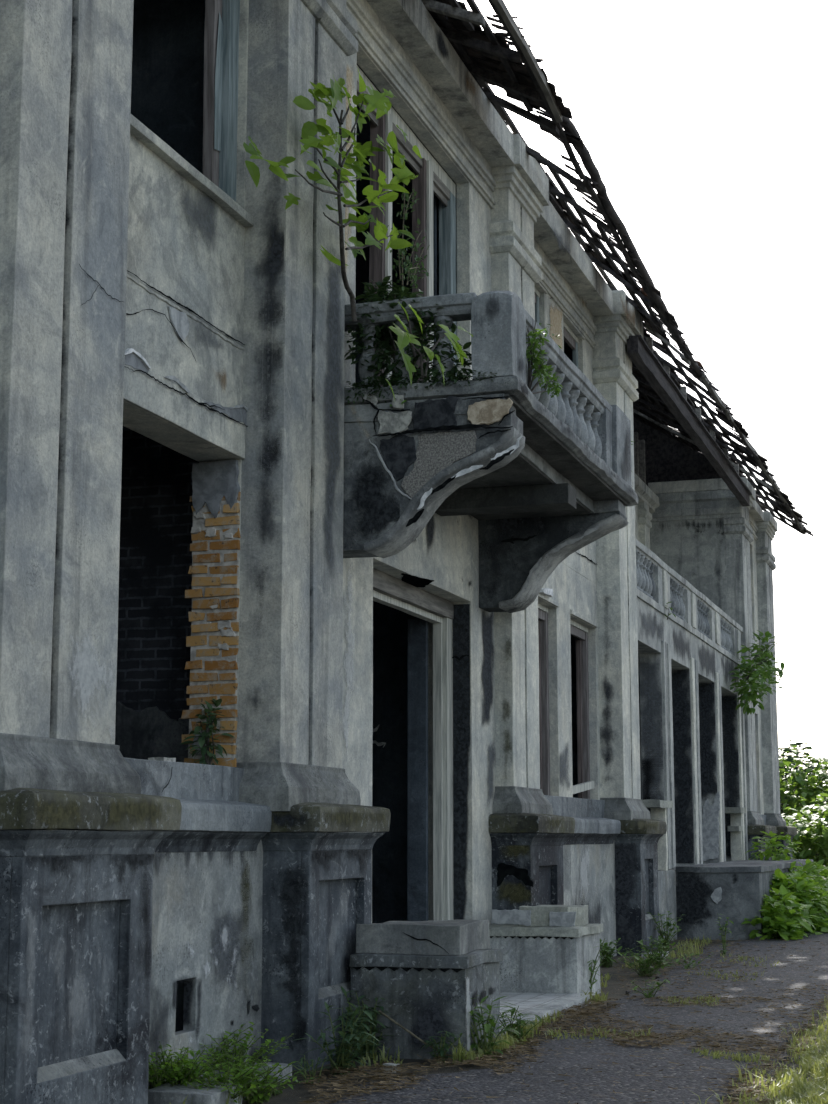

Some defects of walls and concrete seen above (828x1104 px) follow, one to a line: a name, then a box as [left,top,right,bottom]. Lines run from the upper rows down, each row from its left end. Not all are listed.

crack [79,264,248,427]
damp [257,204,284,420]
damp [260,438,278,540]
spalling [360,393,522,527]
damp [600,680,612,765]
crack [404,933,449,954]